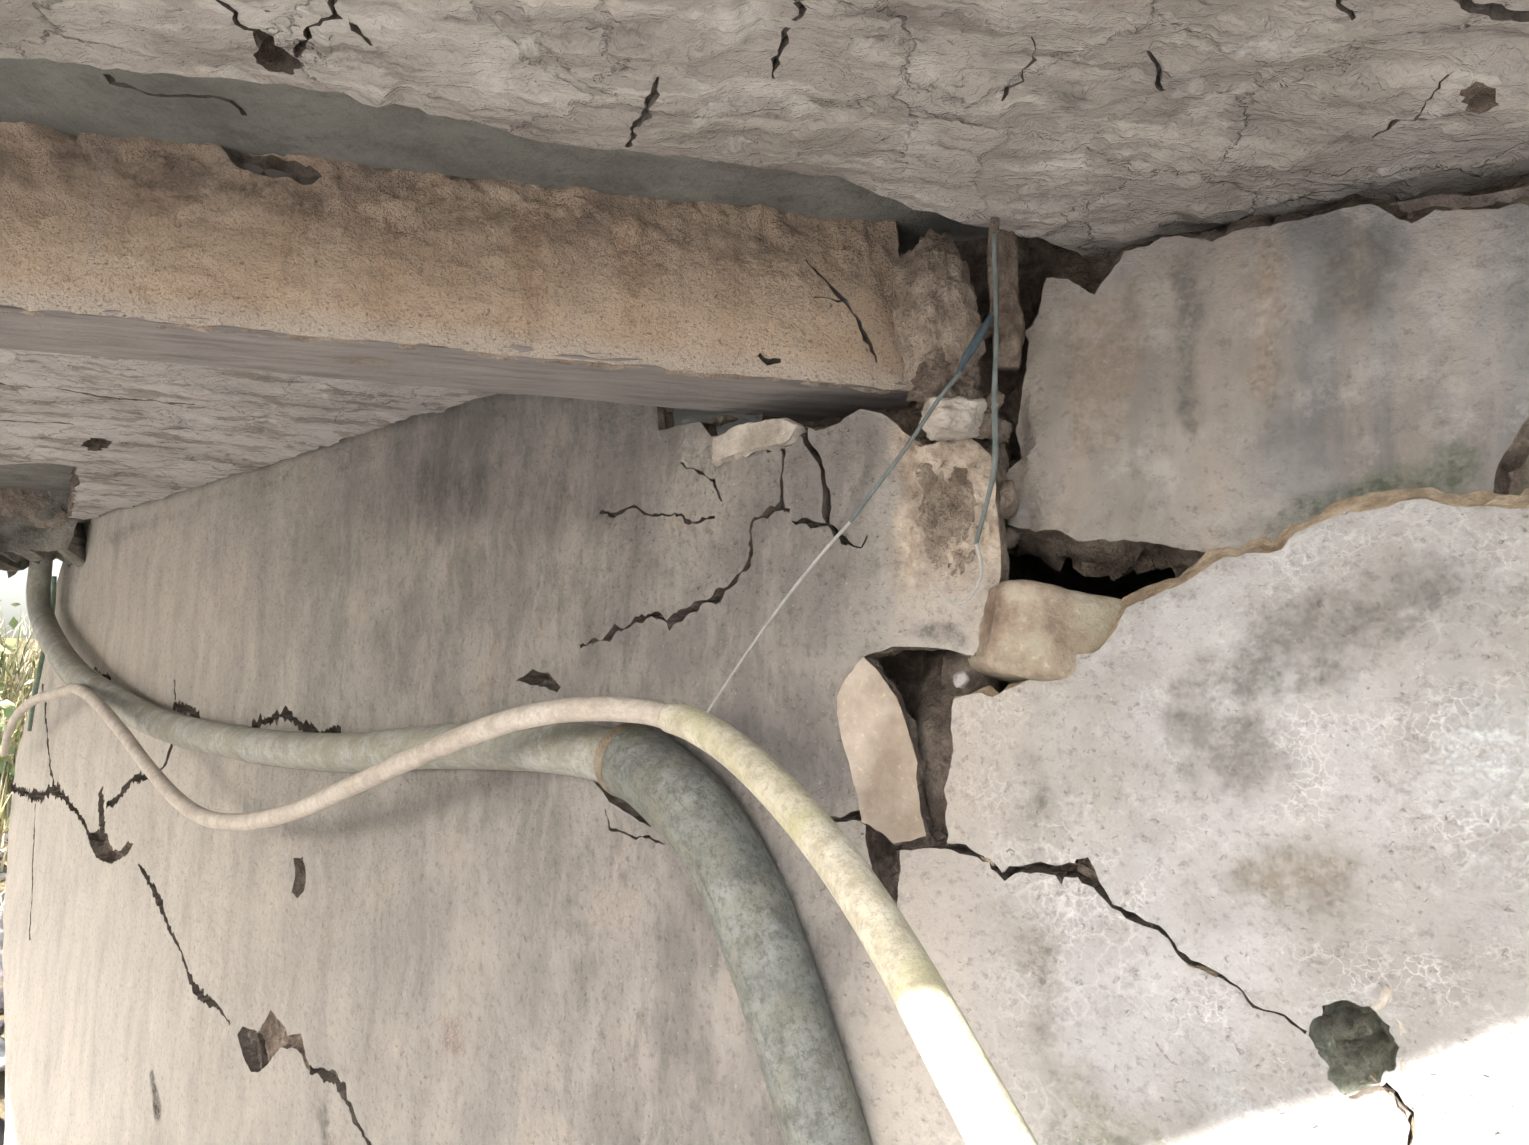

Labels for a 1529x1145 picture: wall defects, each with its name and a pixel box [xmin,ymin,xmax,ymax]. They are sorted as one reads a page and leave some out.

crack [216,0,373,58]
spalling [0,487,68,530]
crack [580,421,868,648]
spalling [913,460,986,577]
water stain [1233,582,1454,693]
crack [10,680,201,940]
peeling [837,657,931,905]
crack [138,864,230,1026]
crack [830,810,1307,1034]
spalling [237,1010,314,1072]
flaking render [1371,984,1407,1036]
crack [310,1065,372,1145]